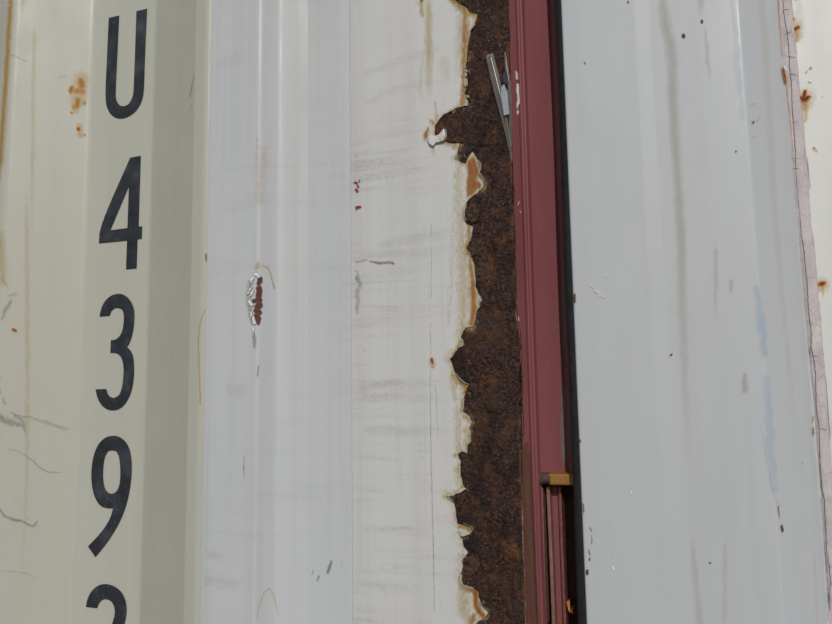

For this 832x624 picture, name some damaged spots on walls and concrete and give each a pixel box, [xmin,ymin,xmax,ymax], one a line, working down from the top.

corrosion [69,78,85,114]
corrosion [800,89,812,121]
peeling [247,272,263,332]
corrosion [424,0,538,624]